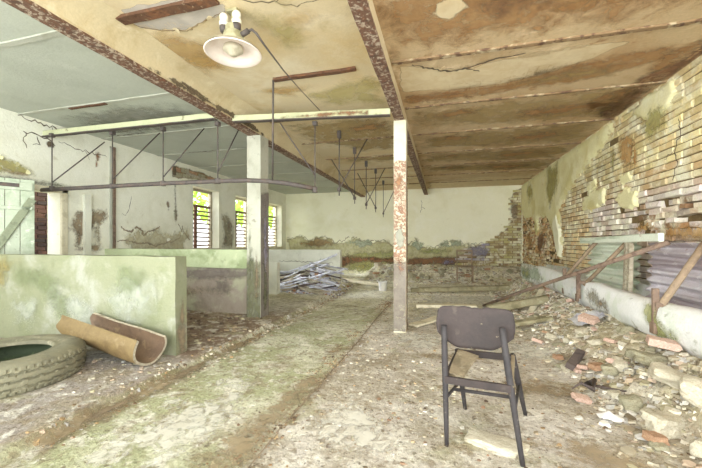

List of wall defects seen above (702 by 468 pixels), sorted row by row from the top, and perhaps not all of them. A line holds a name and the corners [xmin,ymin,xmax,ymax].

peeling [122,0,182,13]
peeling [134,4,225,33]
leakage [406,40,702,171]
peeling [633,79,681,135]
crack [21,115,105,156]
crack [665,119,681,180]
peeling [287,123,615,270]
spalling [615,172,702,241]
peeling [117,224,190,249]